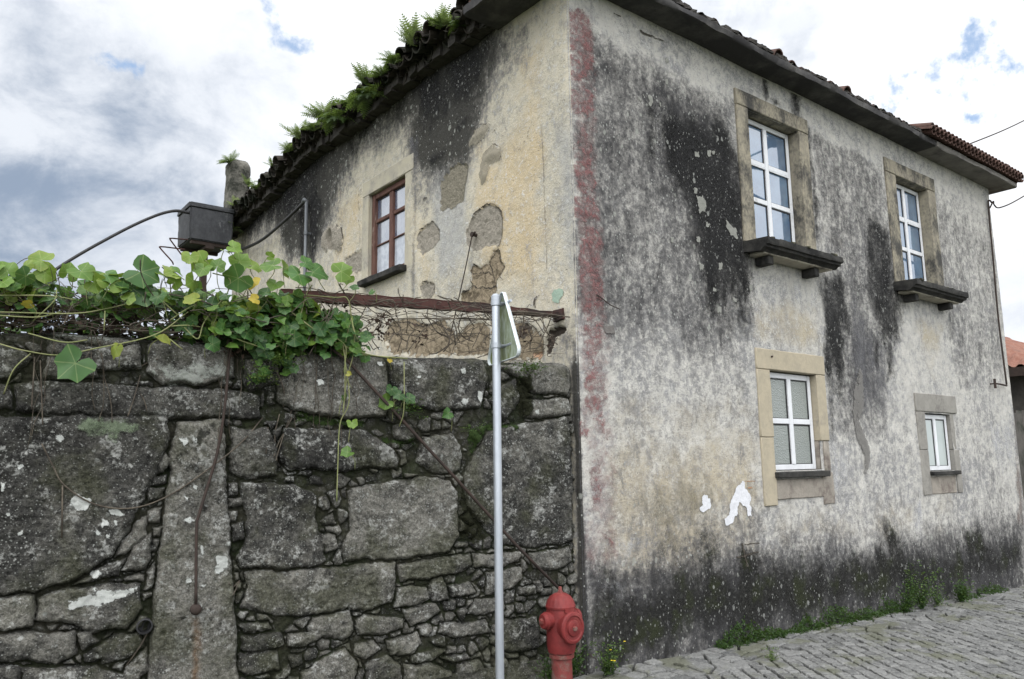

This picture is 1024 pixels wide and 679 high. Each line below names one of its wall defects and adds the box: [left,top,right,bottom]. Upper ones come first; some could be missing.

water stain [399,34,491,127]
water stain [244,150,332,260]
spalling [416,221,440,255]
spalling [440,162,468,212]
spalling [461,203,505,304]
water stain [648,107,754,328]
spalling [384,319,492,358]
spalling [510,321,567,362]
water stain [820,219,902,428]
peeling [700,495,711,512]
peeling [725,481,755,526]
water stain [592,524,1019,662]